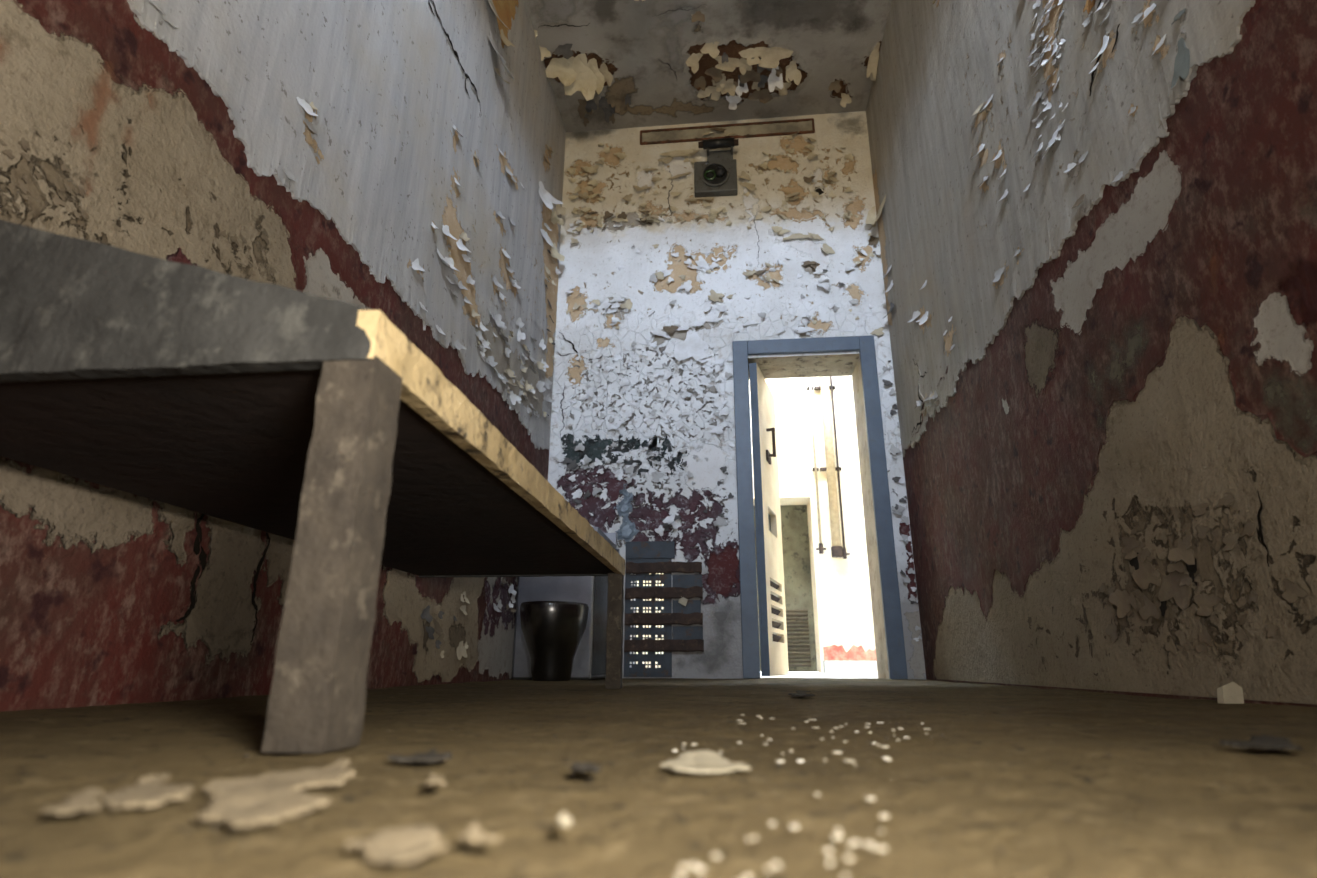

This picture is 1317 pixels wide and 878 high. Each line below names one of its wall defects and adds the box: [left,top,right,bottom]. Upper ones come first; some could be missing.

crack [428,0,482,116]
peeling [0,0,894,568]
peeling [882,0,1317,705]
peeling [0,457,295,667]
peeling [381,565,518,684]